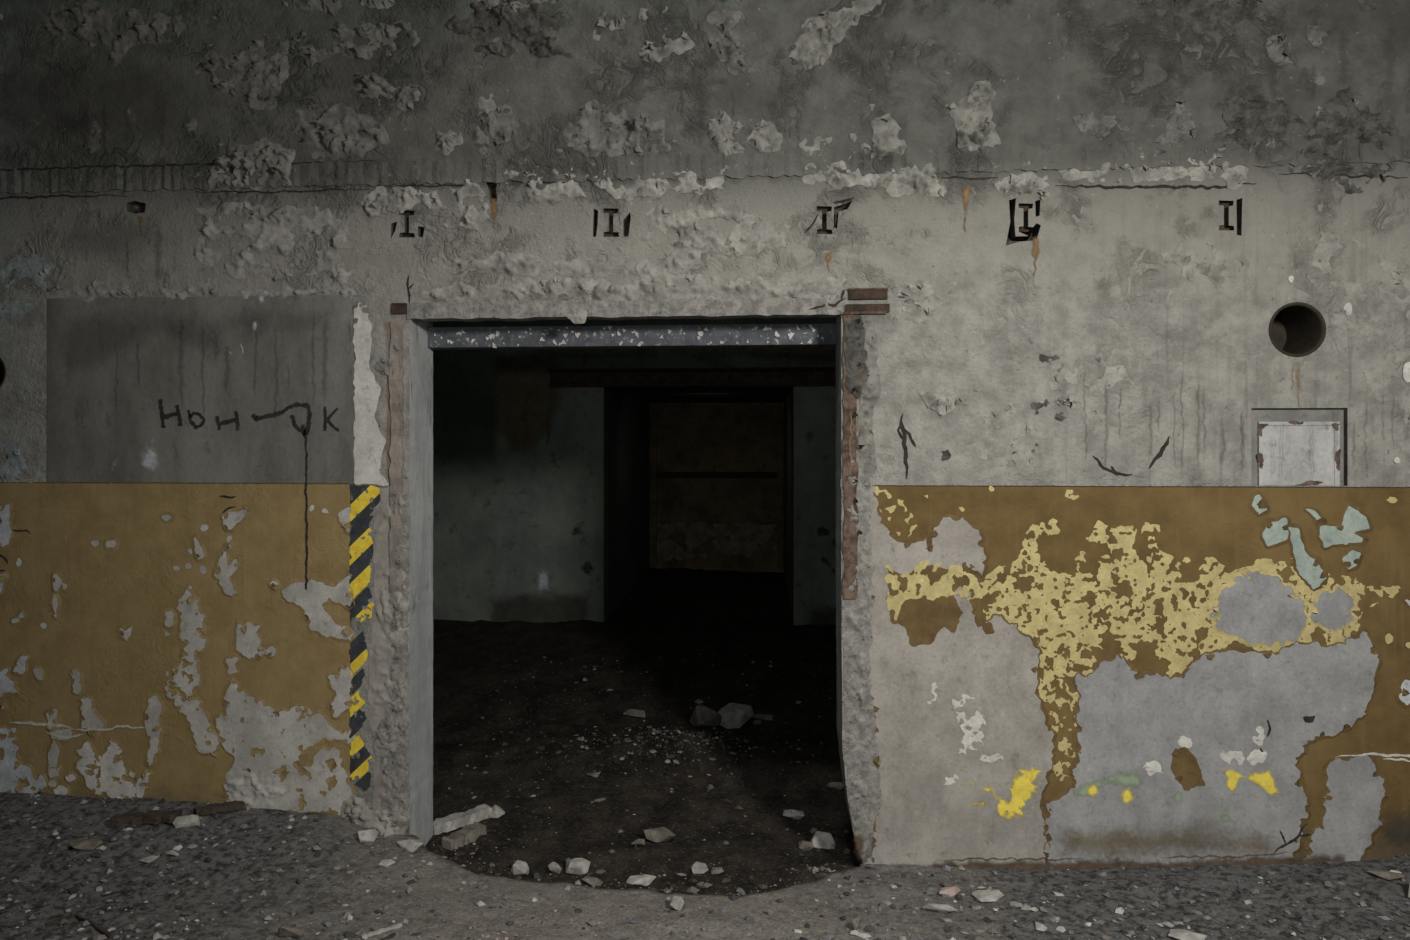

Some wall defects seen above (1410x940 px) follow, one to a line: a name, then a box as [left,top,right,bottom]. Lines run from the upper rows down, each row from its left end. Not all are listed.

flaking render [444,0,572,58]
rust [1032,238,1040,276]
crack [897,414,916,479]
crack [1093,436,1170,476]
peeling [0,300,411,837]
peeling [840,315,1410,867]